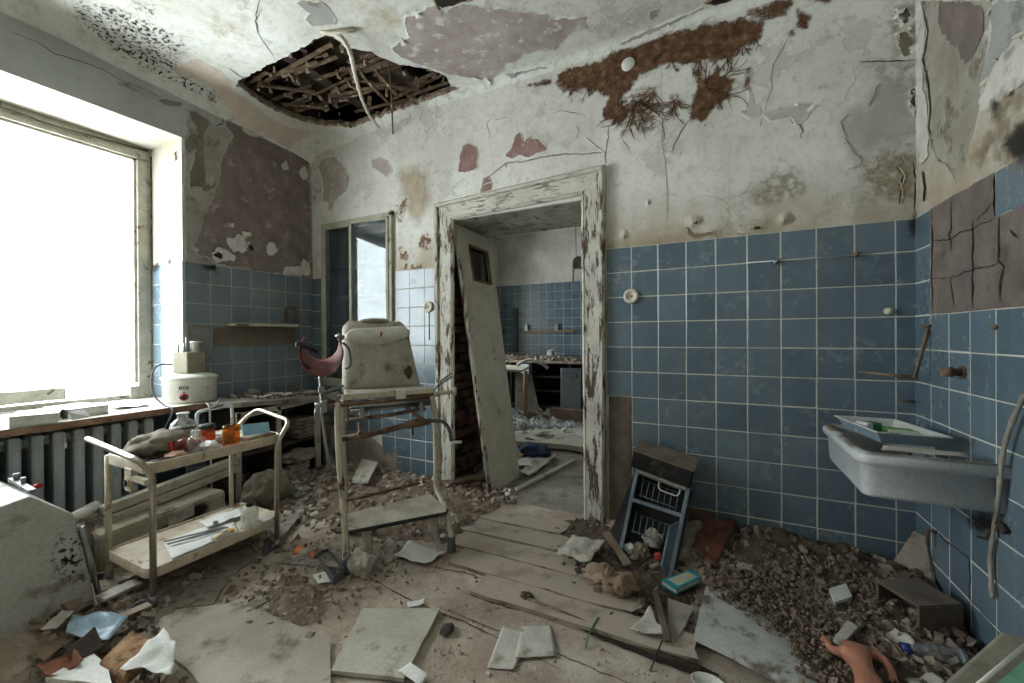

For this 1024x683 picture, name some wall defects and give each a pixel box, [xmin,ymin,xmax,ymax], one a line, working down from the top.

water stain [74,1,216,102]
crack [255,1,275,59]
peeling [391,0,730,87]
peeling [118,58,351,279]
peeling [457,142,494,193]
peeling [505,132,547,160]
crack [480,111,631,191]
crack [661,94,689,216]
peeling [742,84,814,126]
crack [841,1,1016,312]
peeling [890,0,1024,314]